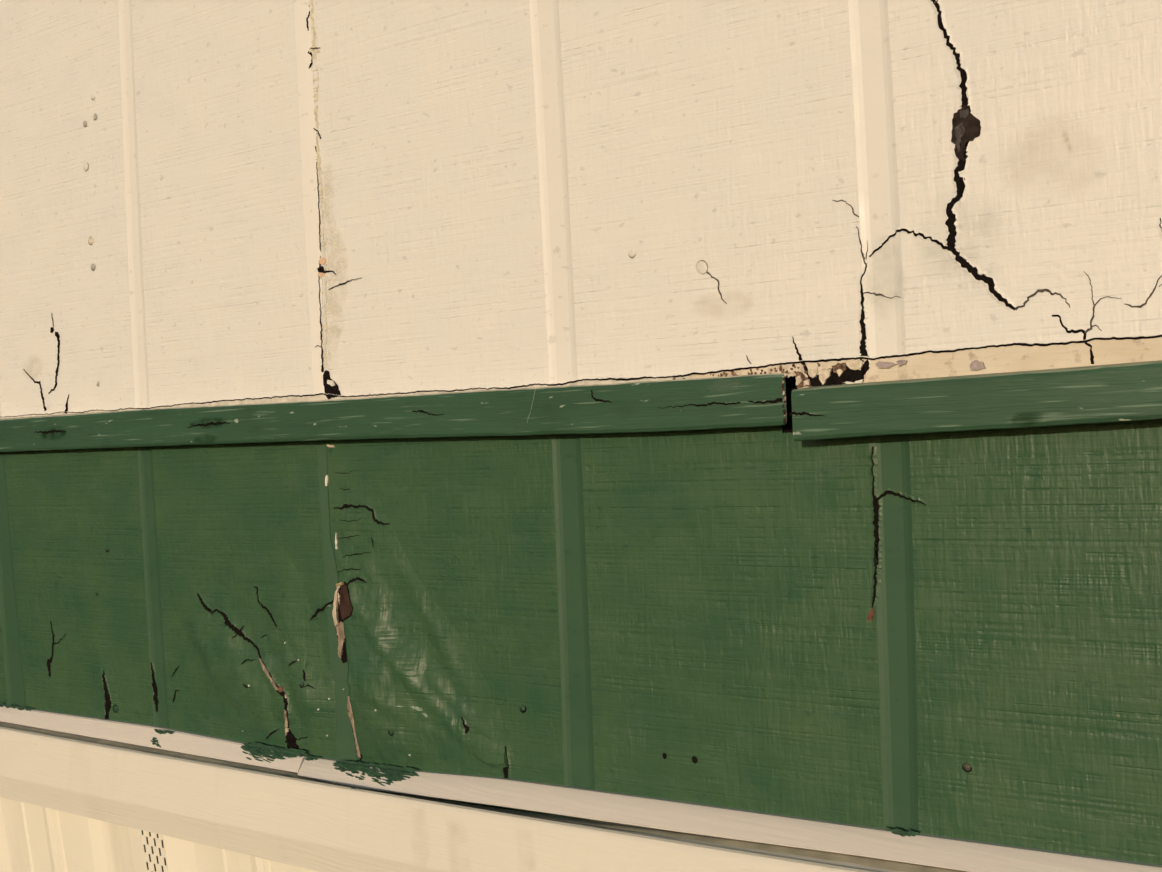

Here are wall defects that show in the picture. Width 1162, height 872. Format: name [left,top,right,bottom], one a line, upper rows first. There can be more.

crack [306,6,320,68]
crack [313,128,361,372]
peeling [0,0,1162,424]
crack [832,0,1162,370]
crack [23,313,69,434]
crack [333,502,390,527]
crack [868,447,927,608]
crack [47,621,66,676]
crack [101,670,113,719]
crack [150,662,159,712]
crack [197,585,300,749]
spalling [336,581,353,663]